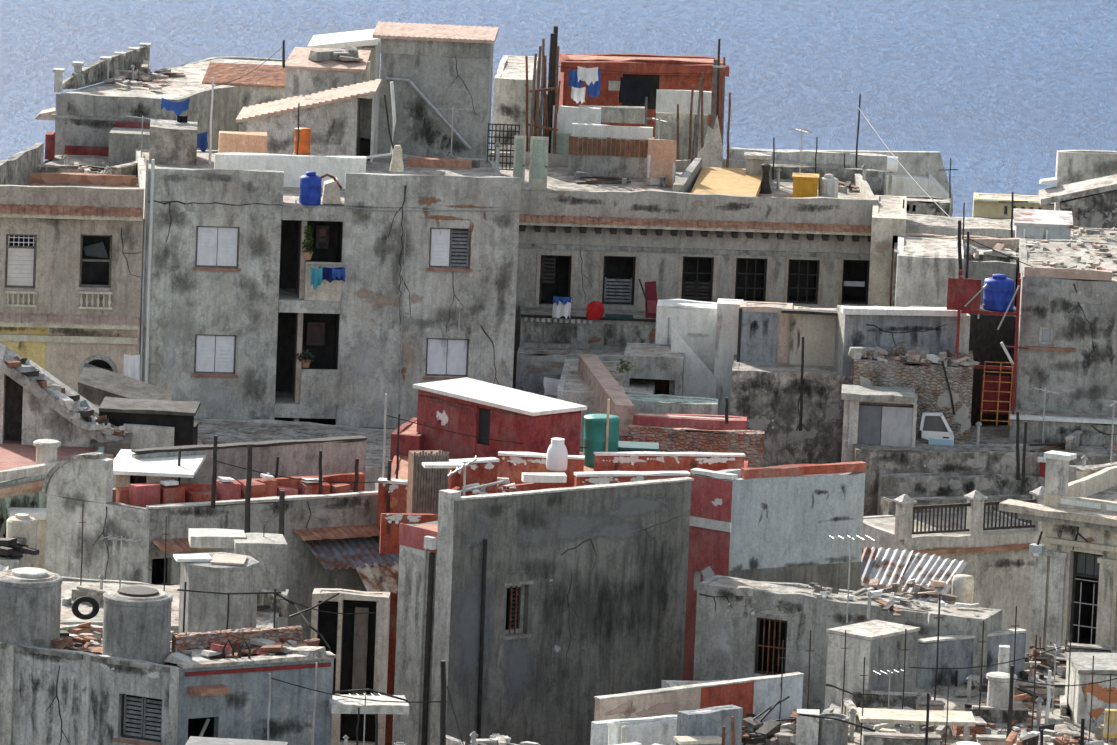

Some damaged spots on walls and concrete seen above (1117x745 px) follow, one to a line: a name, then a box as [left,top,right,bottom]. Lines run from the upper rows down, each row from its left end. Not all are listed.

crack [450,57,476,115]
spalling [1073,202,1117,228]
leakage [1029,300,1114,368]
spalling [436,410,448,426]
crack [45,666,69,745]
peeling [1085,682,1117,719]